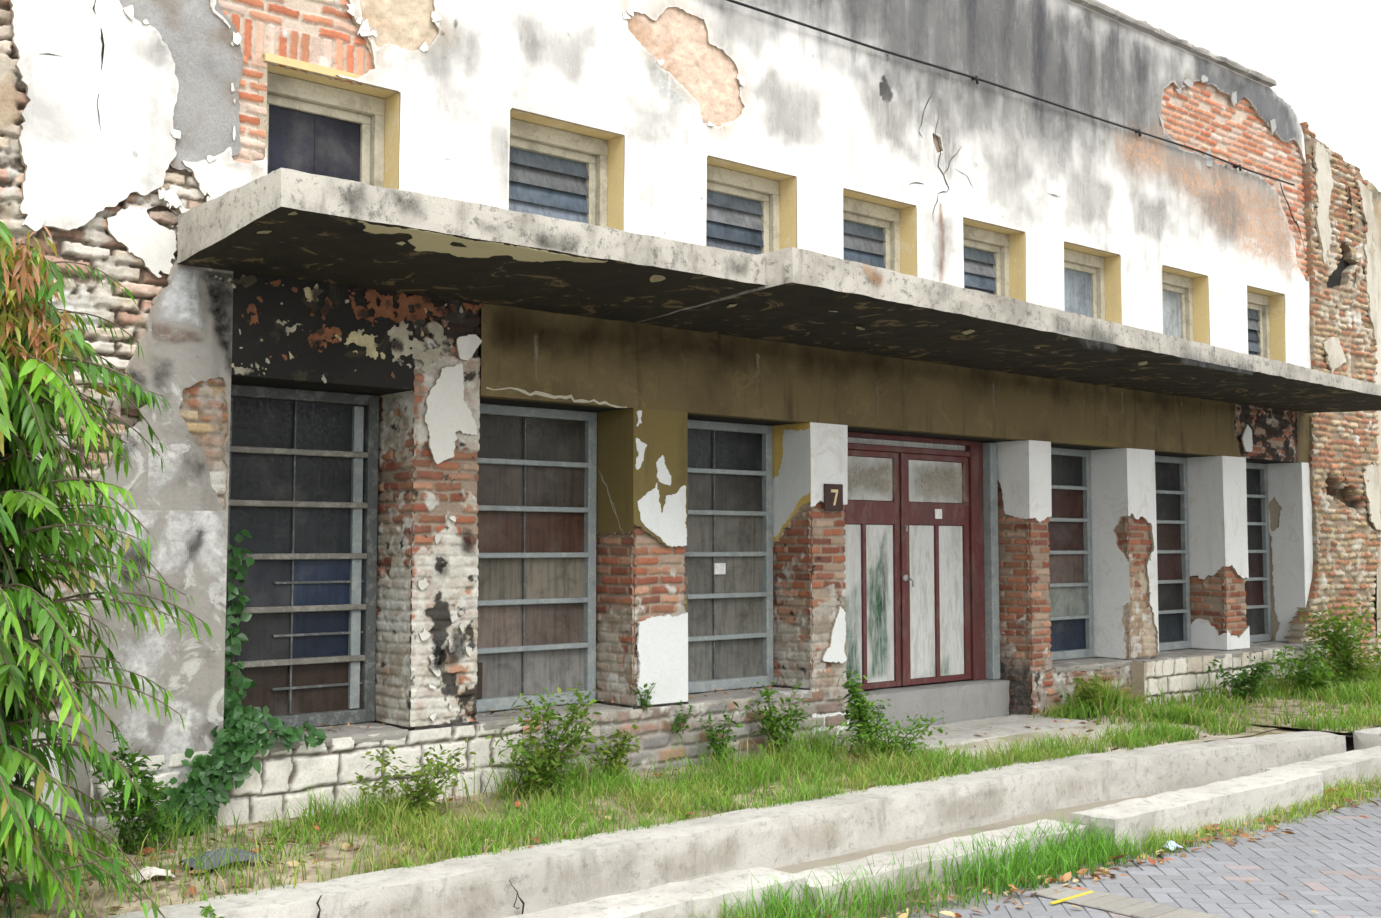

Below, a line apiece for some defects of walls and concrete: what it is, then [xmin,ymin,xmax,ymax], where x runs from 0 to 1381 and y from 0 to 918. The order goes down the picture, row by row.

peeling [358,221,607,263]
damp [538,235,576,251]
flaking render [622,6,746,127]
damp [843,0,1297,260]
flaking render [1159,75,1308,280]
spalling [1327,247,1349,289]
flaking render [0,0,483,742]
flaking render [596,410,688,706]
flaking render [773,428,847,692]
flaking render [1115,515,1157,659]
flaking render [1190,564,1247,637]